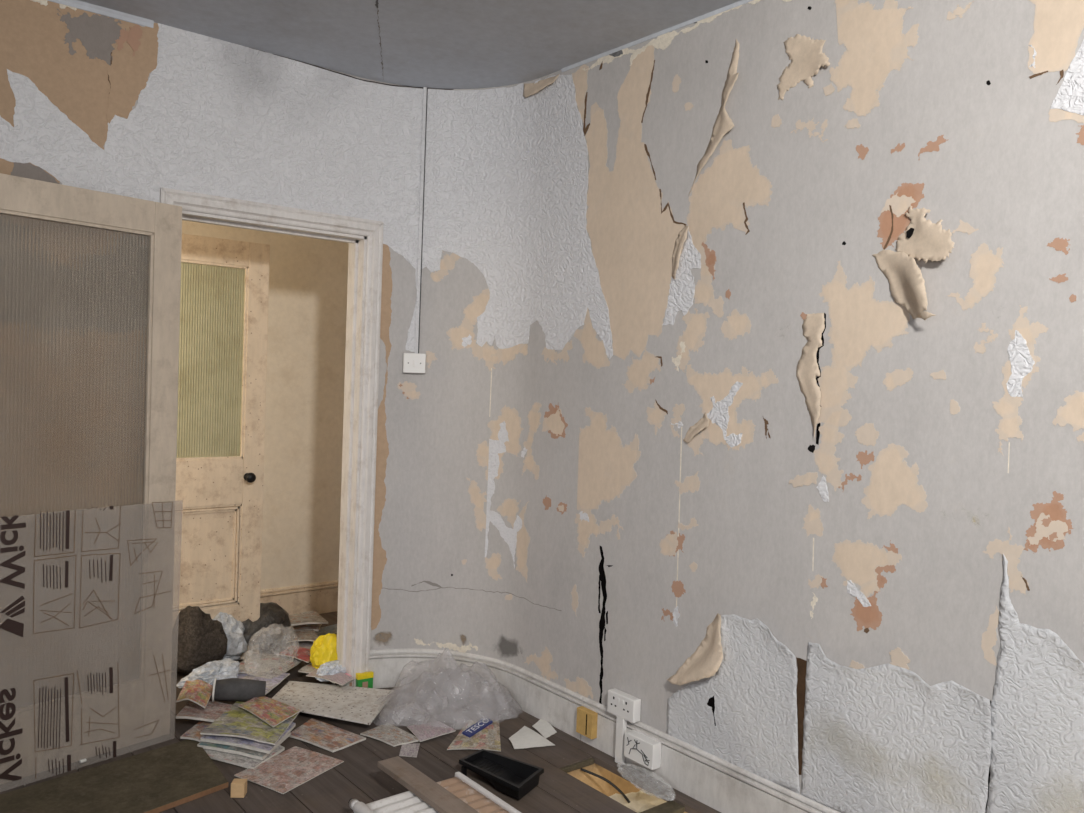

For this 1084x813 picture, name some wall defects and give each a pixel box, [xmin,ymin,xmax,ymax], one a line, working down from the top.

peeling [30,0,129,93]
peeling [582,0,760,71]
peeling [688,39,740,196]
peeling [11,162,59,184]
peeling [872,182,954,320]
peeling [796,312,825,440]
flaking render [838,450,875,491]
flaking render [1023,491,1074,554]
crack [382,581,562,611]
crack [598,546,613,704]
peeling [667,613,723,686]
flaking render [850,540,898,633]